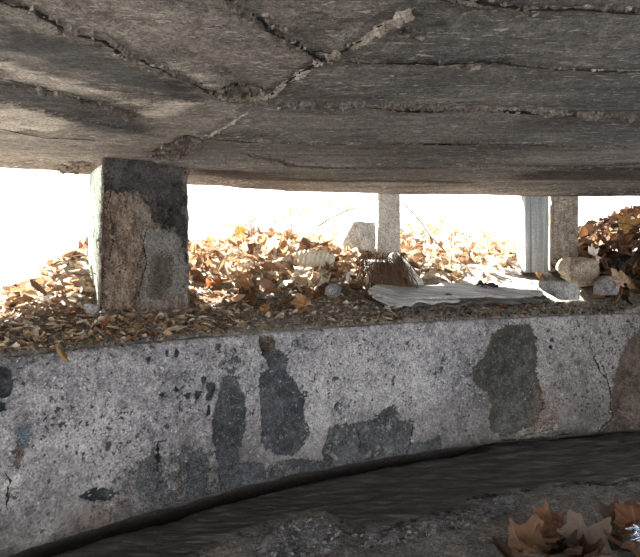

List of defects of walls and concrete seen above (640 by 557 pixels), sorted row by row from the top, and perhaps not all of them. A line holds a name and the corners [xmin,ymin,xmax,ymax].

crack [0,129,95,141]
crack [0,76,153,123]
crack [0,0,219,96]
crack [165,0,640,170]
leakage [102,335,325,521]
leakage [472,324,544,438]
crack [589,338,614,437]